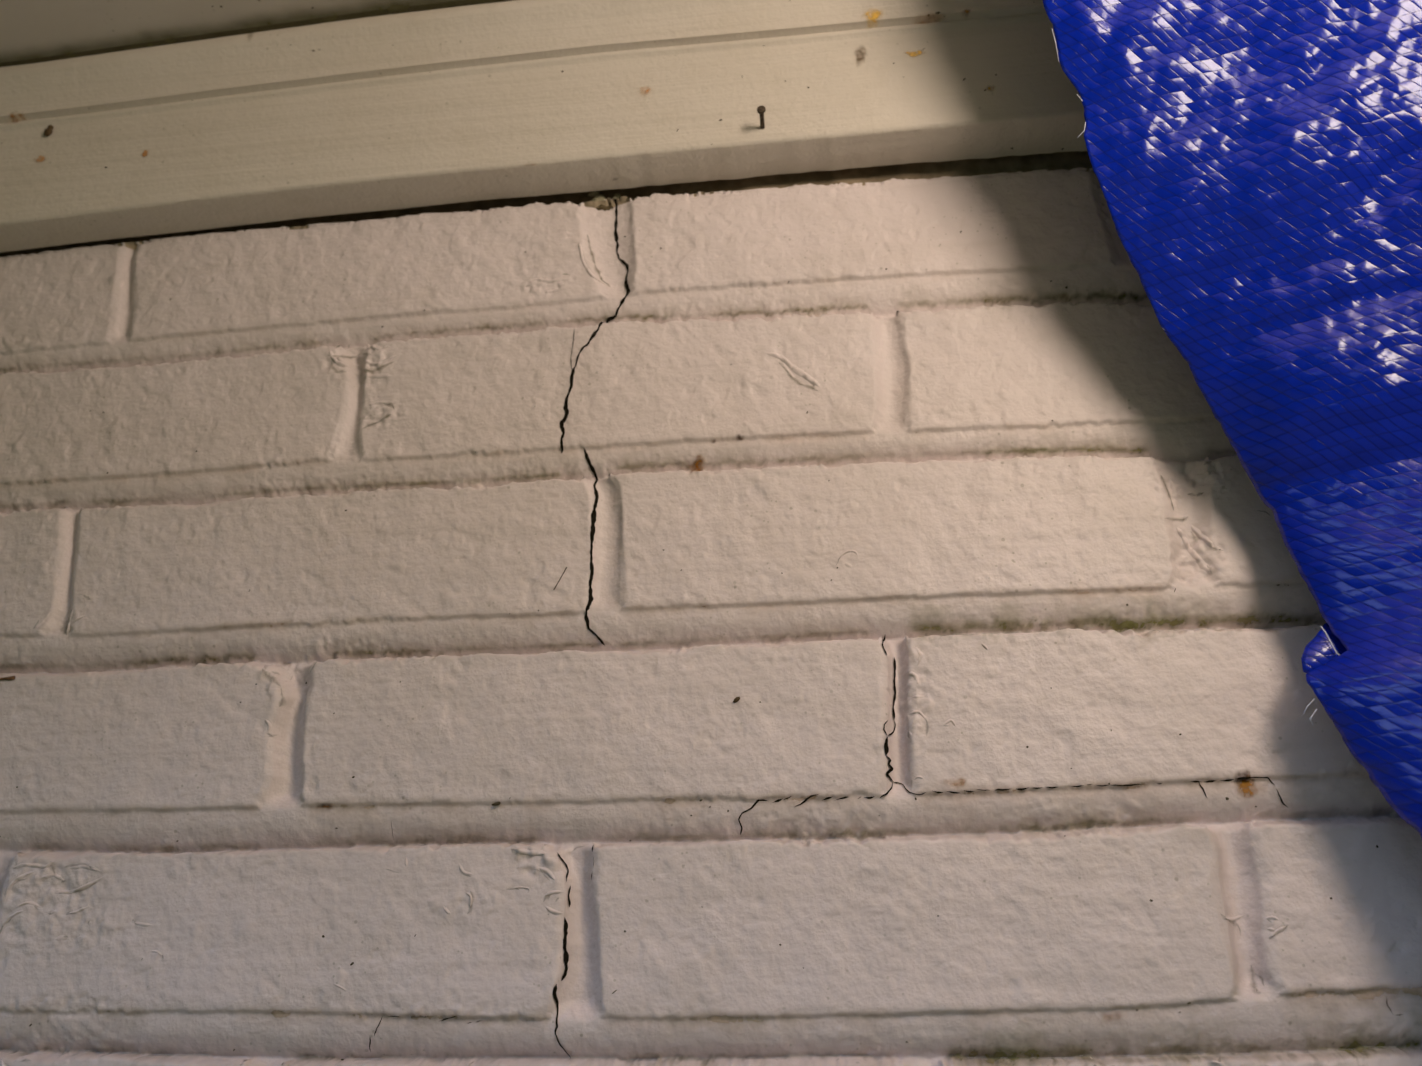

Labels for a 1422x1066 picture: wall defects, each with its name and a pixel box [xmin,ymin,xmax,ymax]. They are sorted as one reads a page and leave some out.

crack [560,199,630,645]
crack [738,636,1289,835]
crack [553,847,594,1059]